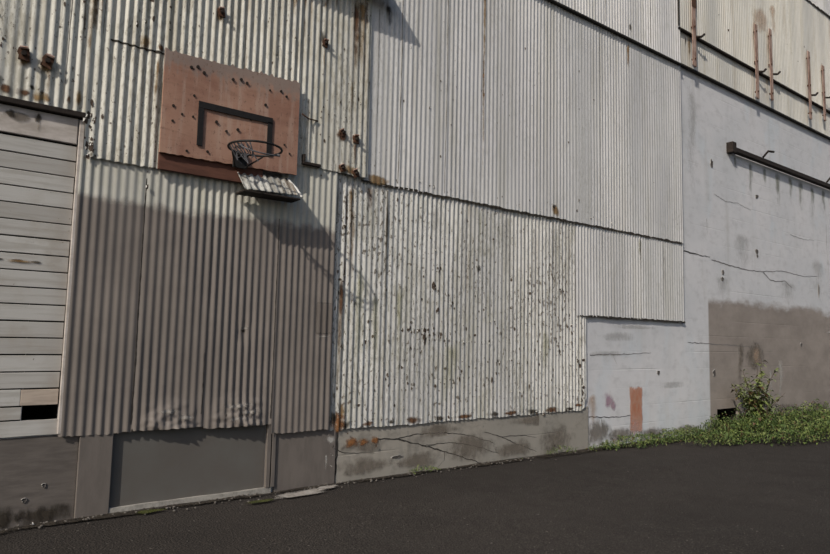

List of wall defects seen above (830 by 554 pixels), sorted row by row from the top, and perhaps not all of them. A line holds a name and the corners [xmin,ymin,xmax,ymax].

rust [354,3,368,56]
rust [368,175,386,200]
rust [338,191,354,345]
crack [684,250,817,288]
rust [331,405,349,432]
rust [346,437,378,451]
crack [334,432,535,482]
water stain [0,505,67,529]